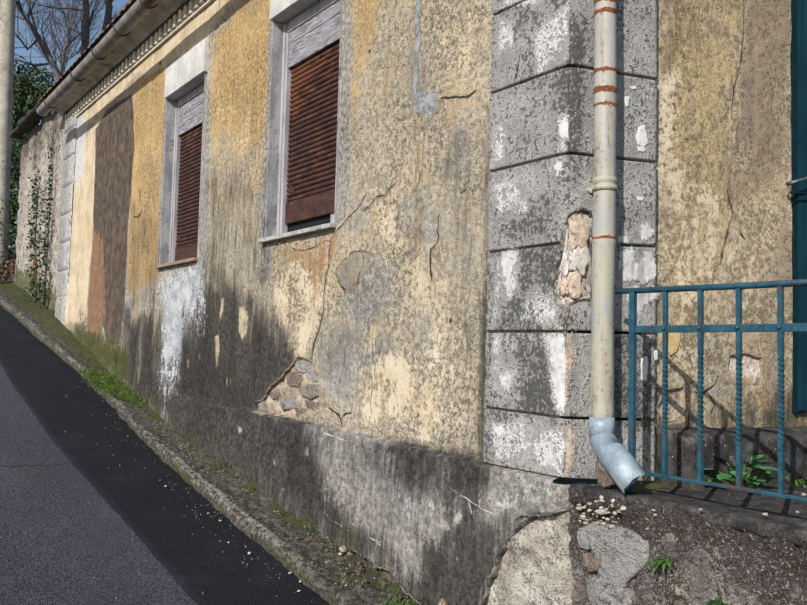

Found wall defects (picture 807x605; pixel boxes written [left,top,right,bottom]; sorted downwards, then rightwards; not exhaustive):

crack [731,0,745,124]
crack [720,189,745,264]
crack [289,181,397,360]
spalling [548,208,593,415]
spalling [250,355,321,419]
spalling [546,422,576,476]
leakage [278,417,468,563]
crack [450,487,535,521]
leakage [414,537,446,602]